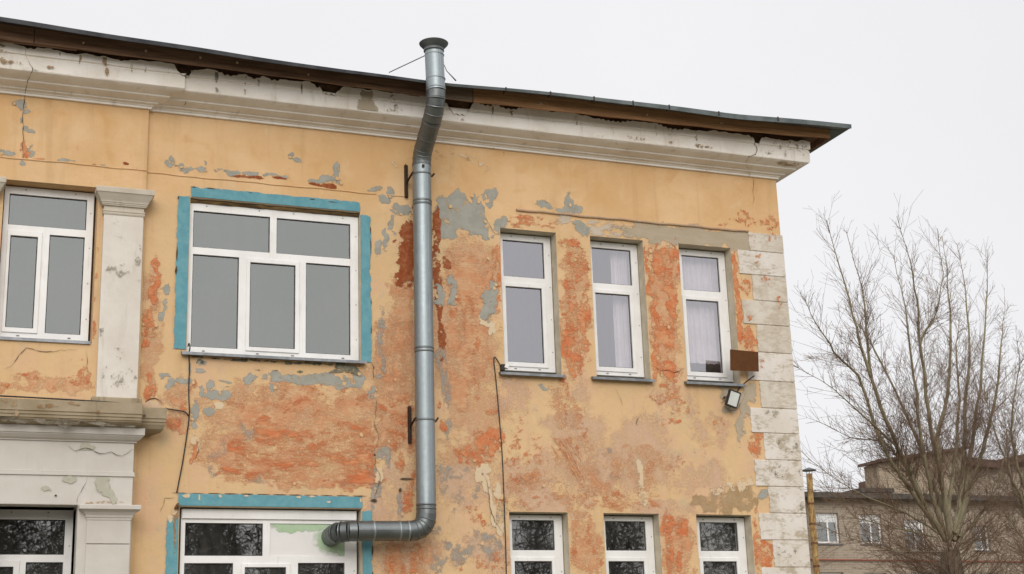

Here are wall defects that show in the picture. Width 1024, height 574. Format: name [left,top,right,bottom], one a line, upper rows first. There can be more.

peeling [0,99,35,166]
crack [22,56,34,154]
flaking render [317,84,342,93]
flaking render [445,99,469,109]
peeling [165,156,288,179]
peeling [0,186,416,521]
peeling [372,188,763,574]